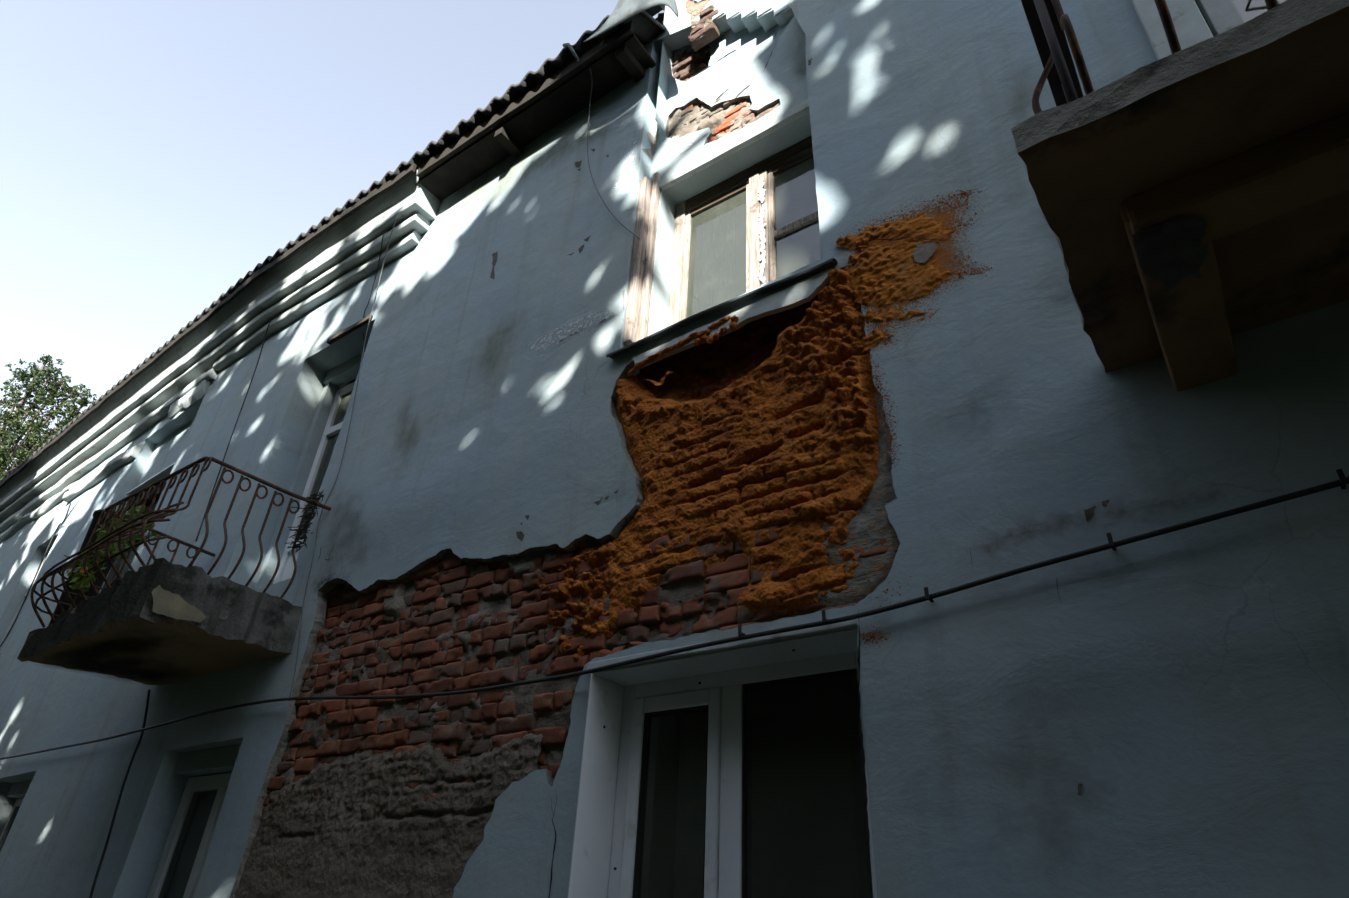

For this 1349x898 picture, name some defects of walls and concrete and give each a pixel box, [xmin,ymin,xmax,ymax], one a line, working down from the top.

spalling [671,0,720,82]
spalling [637,97,781,160]
spalling [490,252,498,279]
peeling [757,178,766,286]
spalling [913,242,938,263]
spalling [632,285,827,402]
spalling [235,392,900,898]
crack [548,788,557,898]